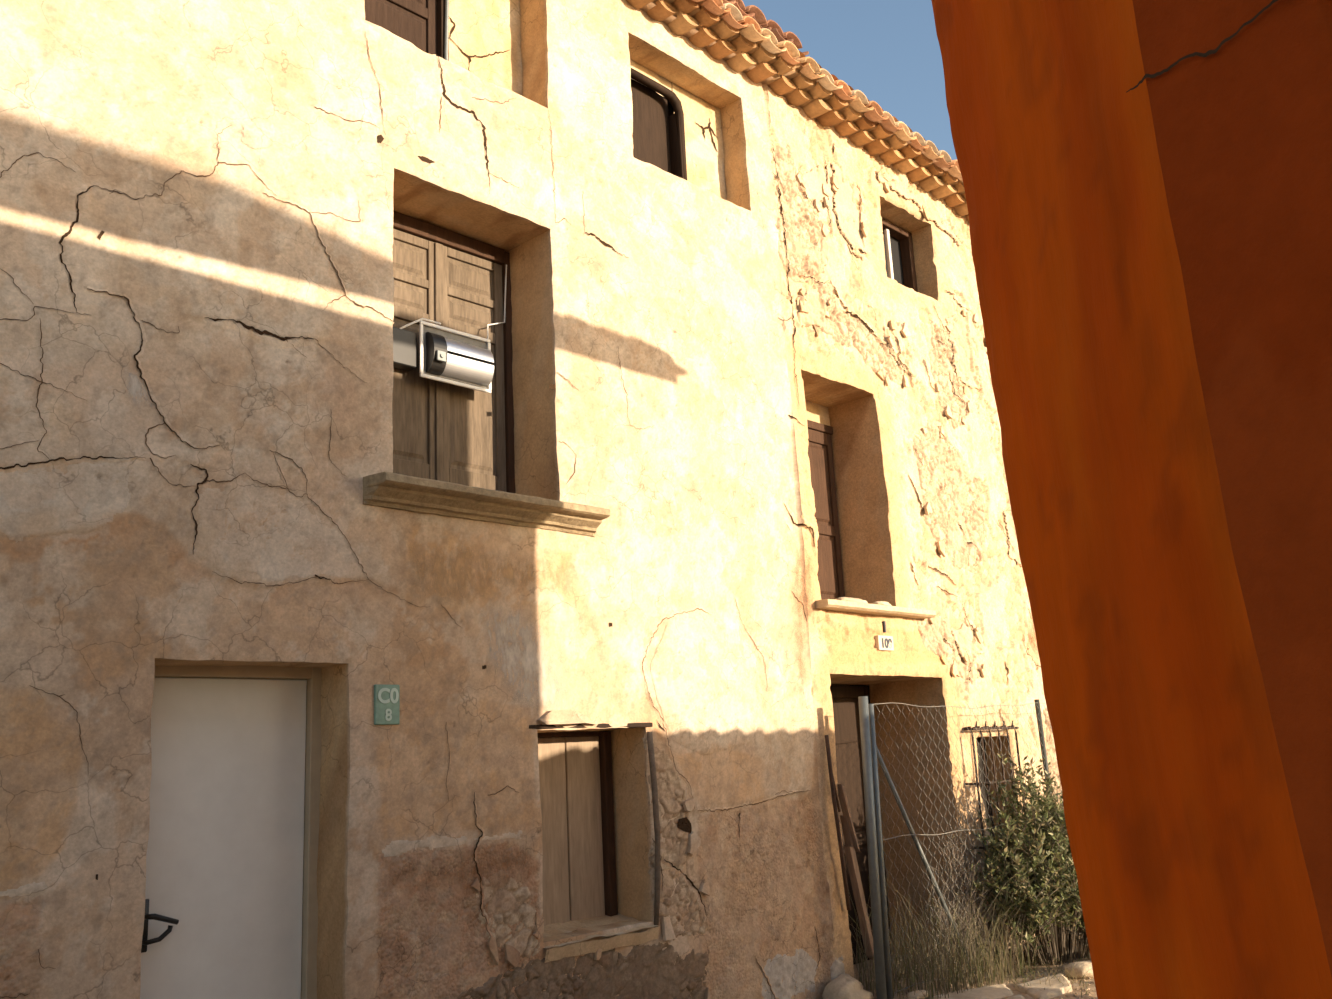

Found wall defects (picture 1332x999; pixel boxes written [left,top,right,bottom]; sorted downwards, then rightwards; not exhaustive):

crack [315,35,384,129]
crack [432,17,519,194]
crack [1126,0,1278,93]
crack [0,125,461,627]
spalling [773,143,987,573]
crack [784,501,817,547]
flaking render [1003,510,1022,567]
spalling [916,616,987,684]
crack [640,599,811,837]
spalling [1043,707,1063,804]
crack [446,722,516,936]